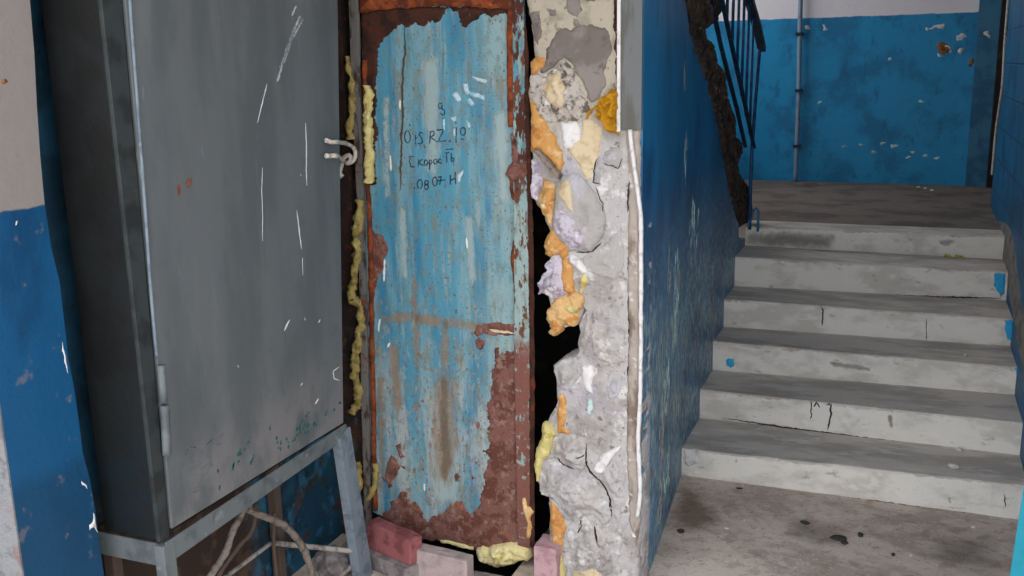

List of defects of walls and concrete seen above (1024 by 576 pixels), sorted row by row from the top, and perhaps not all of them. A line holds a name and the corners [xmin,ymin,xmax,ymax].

peeling [528,0,617,103]
spalling [937,33,974,68]
spalling [684,0,753,227]
peeling [842,142,940,160]
corrosion [358,0,535,550]
crack [558,444,612,545]
peeling [593,446,621,474]
crack [732,402,894,441]